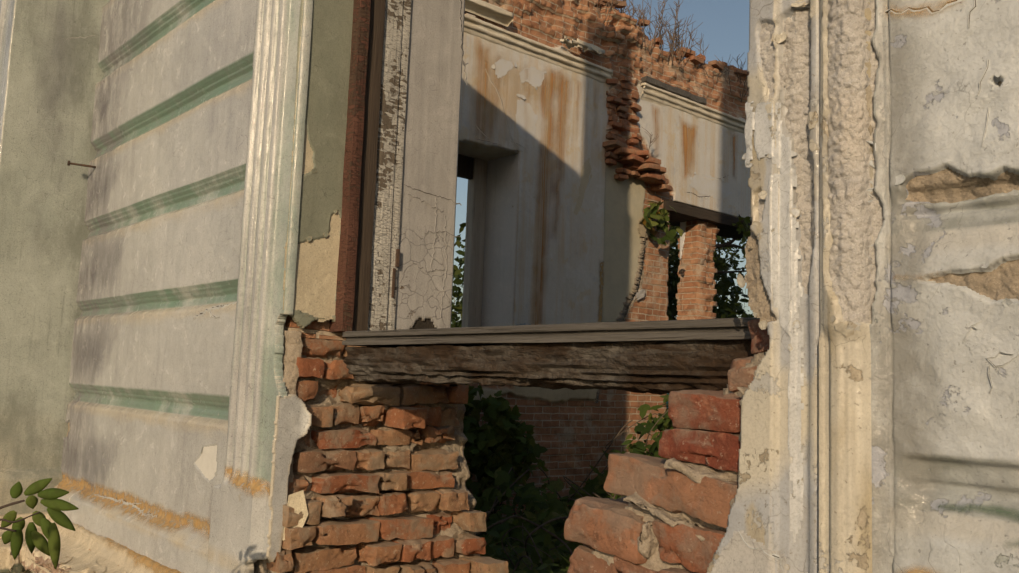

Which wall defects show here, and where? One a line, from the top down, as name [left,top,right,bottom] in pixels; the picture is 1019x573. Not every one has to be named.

crack [885,0,977,28]
peeling [491,58,547,140]
peeling [291,115,317,174]
corrosion [535,73,567,325]
spalling [895,167,1019,203]
peeling [283,210,341,322]
crack [404,184,461,318]
spalling [737,0,884,542]
peeling [195,445,217,480]
peeling [282,490,308,541]
spalling [19,553,73,573]
peeling [707,530,790,573]